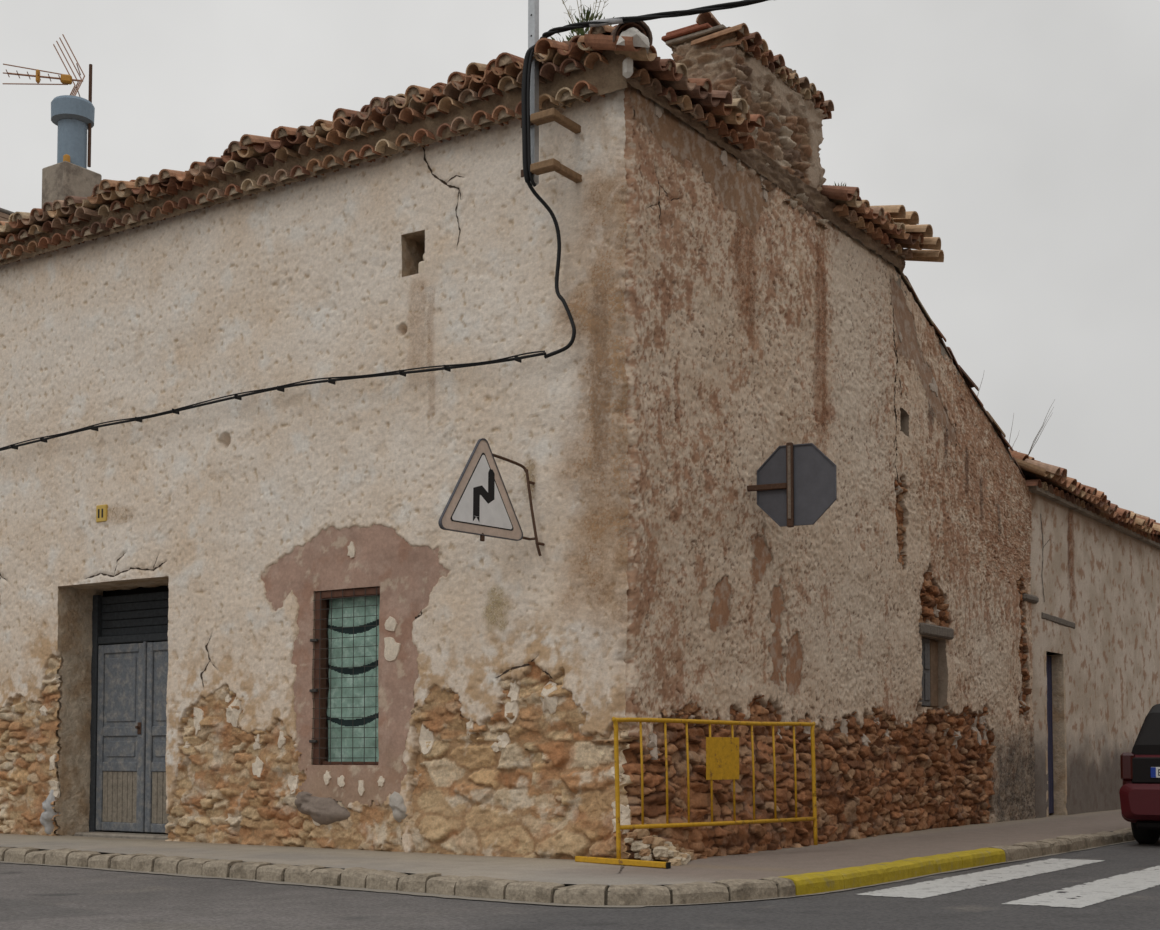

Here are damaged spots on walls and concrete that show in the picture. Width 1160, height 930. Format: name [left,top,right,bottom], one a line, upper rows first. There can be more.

crack [423,147,462,245]
crack [893,309,902,482]
flaking render [894,478,908,569]
flaking render [0,656,62,836]
flaking render [165,524,996,861]
flaking render [1016,578,1032,719]